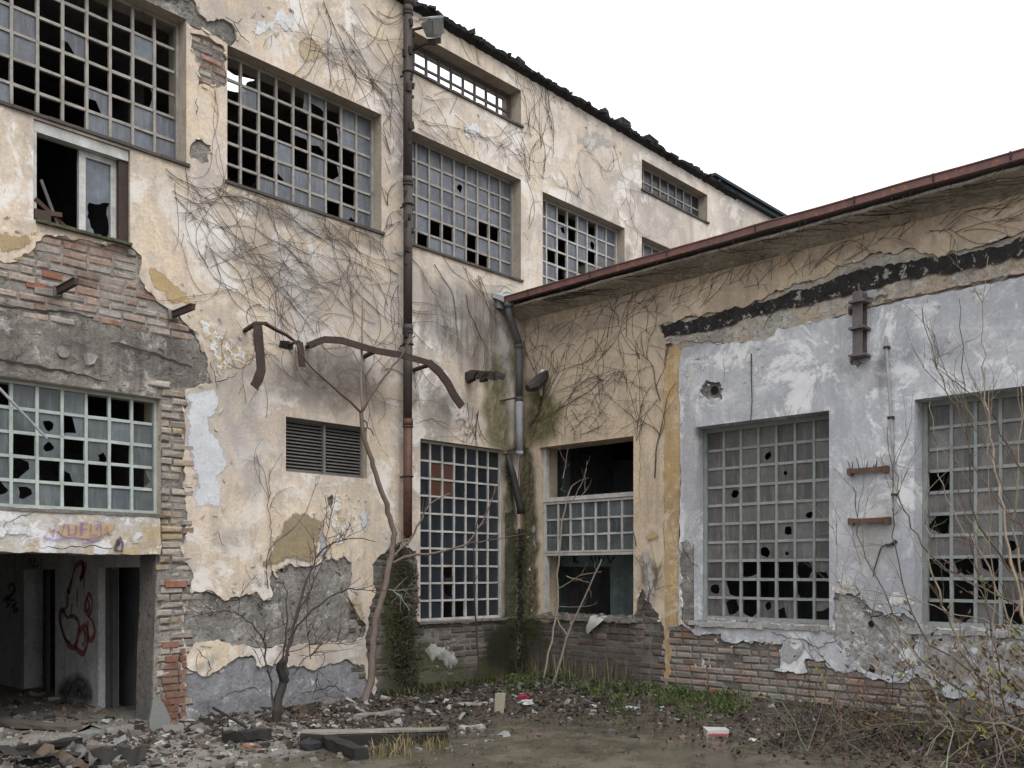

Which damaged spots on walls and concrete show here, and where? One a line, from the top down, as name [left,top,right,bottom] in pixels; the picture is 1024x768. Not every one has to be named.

spalling [146,0,240,95]
spalling [190,137,213,164]
spalling [0,215,1024,723]